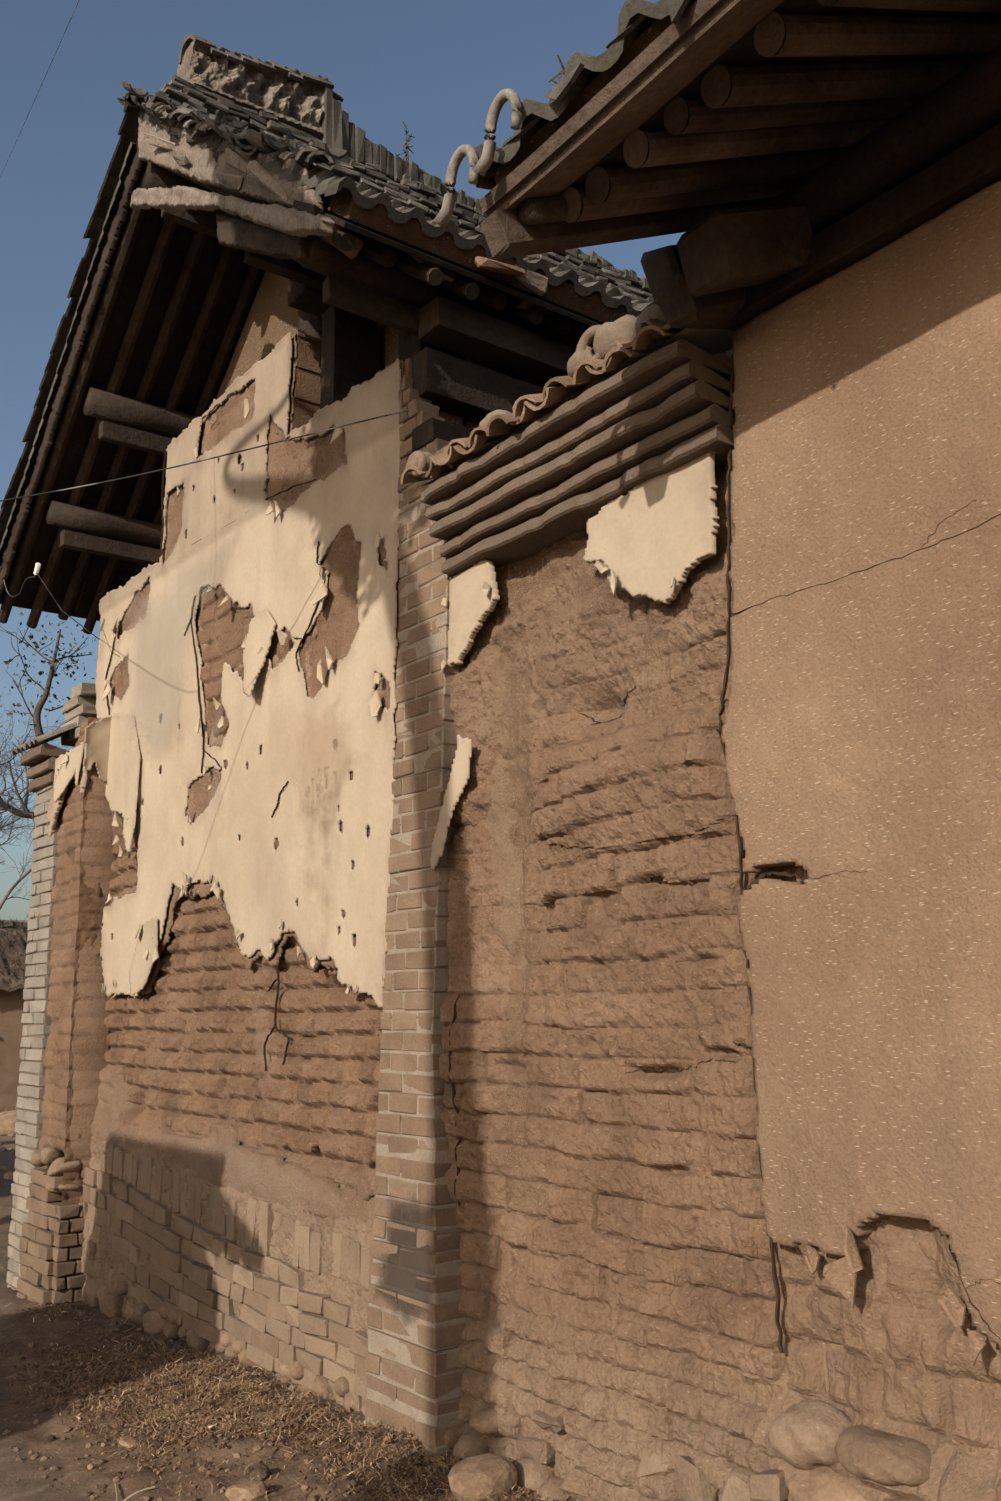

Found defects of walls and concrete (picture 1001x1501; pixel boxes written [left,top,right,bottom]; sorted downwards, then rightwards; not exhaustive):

spalling [193,380,347,518]
peeling [440,559,500,672]
peeling [583,451,720,604]
crack [716,355,1001,757]
spalling [182,525,390,845]
peeling [210,877,221,900]
peeling [430,734,472,871]
crack [735,815,866,895]
peeling [101,918,159,998]
crack [625,950,762,1177]
crack [769,1237,785,1354]
spalling [752,1215,1001,1501]